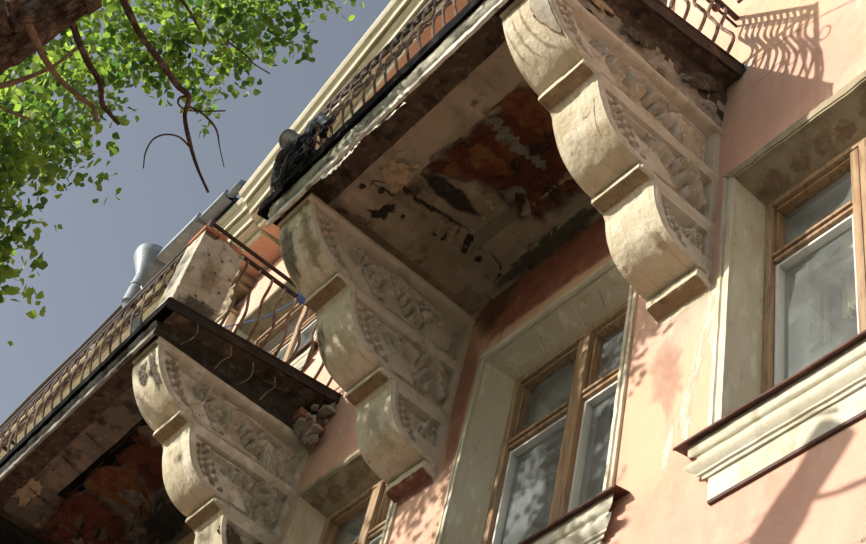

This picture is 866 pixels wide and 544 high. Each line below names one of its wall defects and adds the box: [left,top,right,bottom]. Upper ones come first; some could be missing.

spalling [316,102,405,183]
peeling [380,151,433,219]